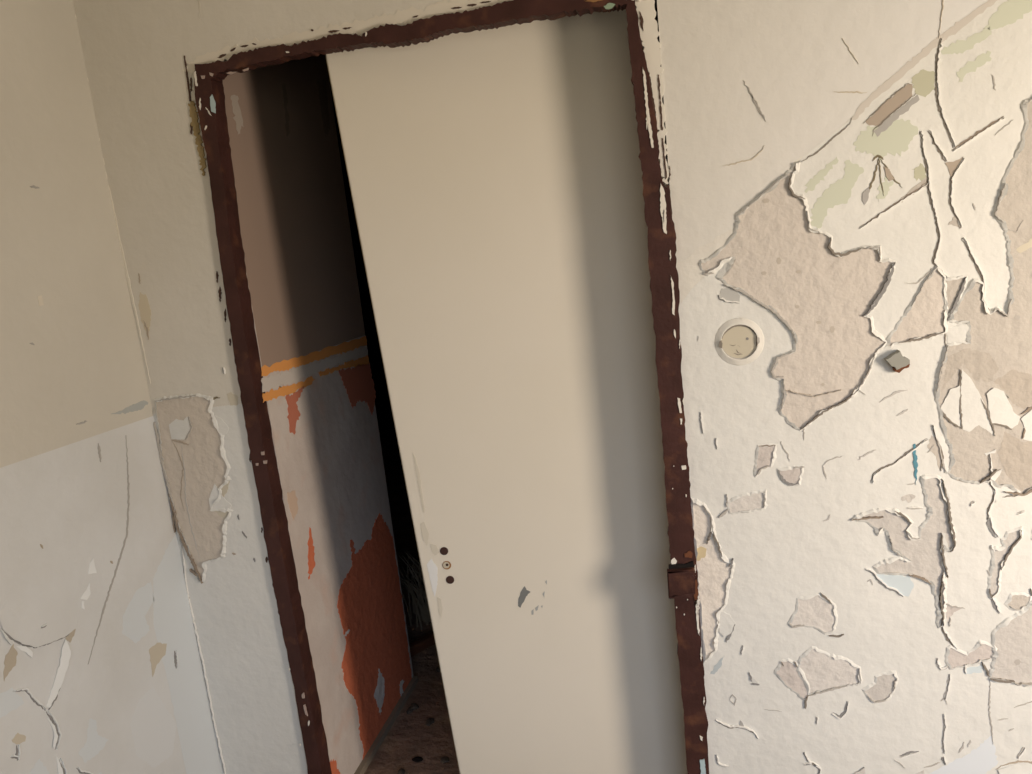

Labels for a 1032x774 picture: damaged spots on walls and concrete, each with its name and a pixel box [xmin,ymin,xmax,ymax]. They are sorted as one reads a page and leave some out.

rust [188,101,207,176]
crack [800,0,1013,389]
peeling [261,346,376,435]
peeling [698,69,1032,628]
crack [88,439,130,664]
peeling [149,393,233,774]
peeling [337,513,412,759]
rust [684,546,707,561]
peeling [691,489,768,674]
peeling [787,592,844,638]
peeling [774,646,899,709]
peeling [944,526,1032,687]